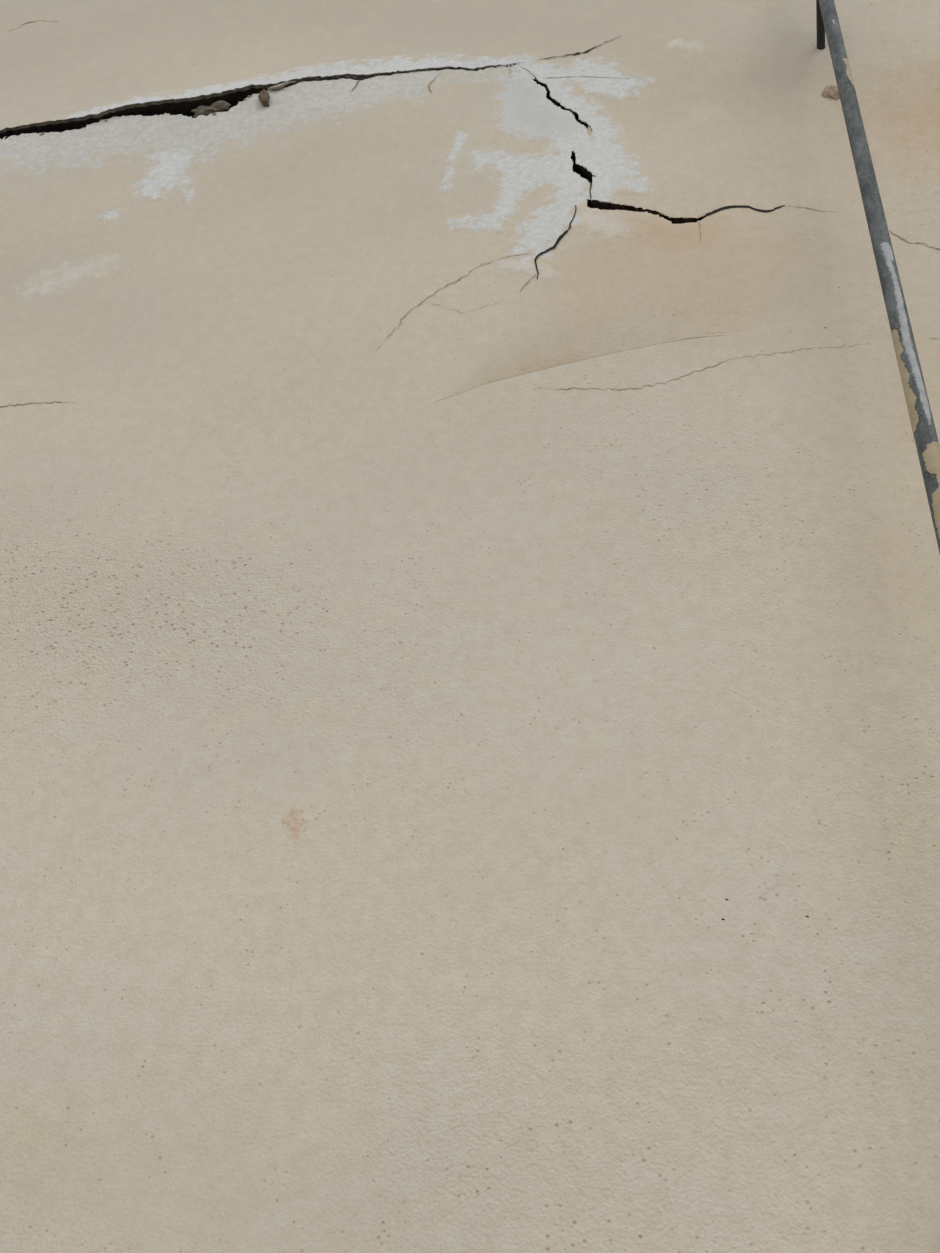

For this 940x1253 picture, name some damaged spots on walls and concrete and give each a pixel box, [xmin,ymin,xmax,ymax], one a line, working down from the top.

peeling [0,52,660,280]
crack [191,37,834,348]